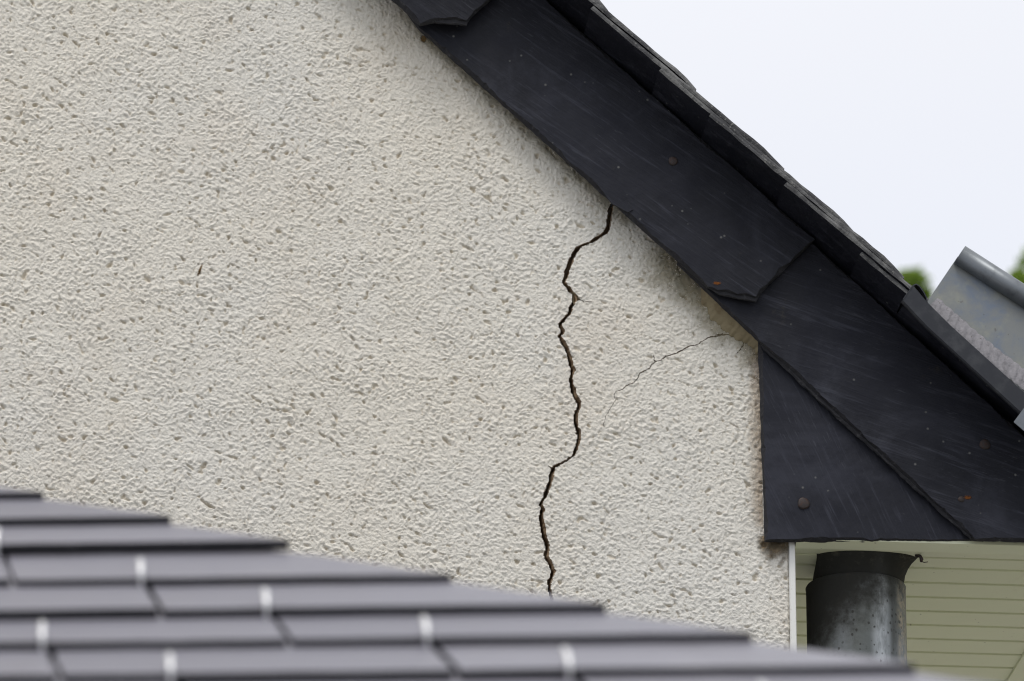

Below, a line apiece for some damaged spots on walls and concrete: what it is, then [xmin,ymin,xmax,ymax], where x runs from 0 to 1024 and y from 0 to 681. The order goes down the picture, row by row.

crack [539,204,744,596]